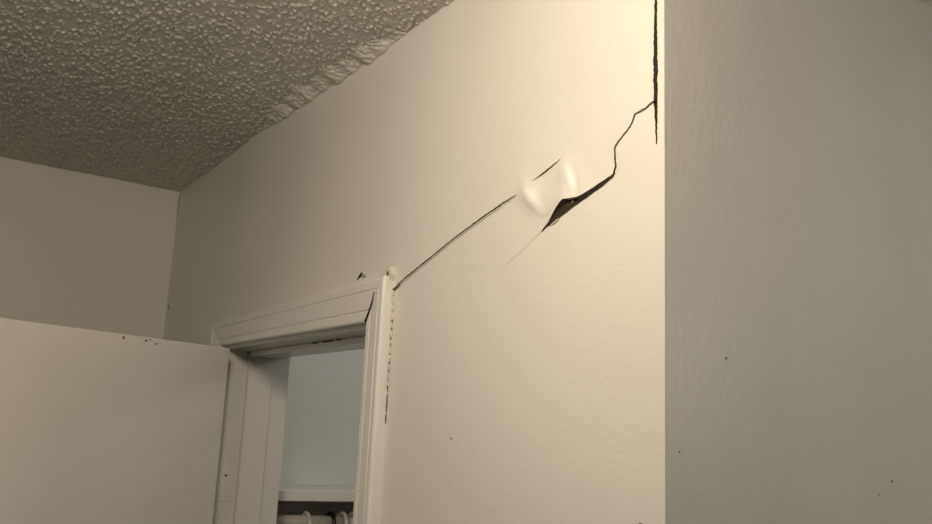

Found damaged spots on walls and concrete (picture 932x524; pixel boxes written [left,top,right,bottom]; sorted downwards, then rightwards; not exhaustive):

crack [542,0,658,231]
crack [365,195,517,323]